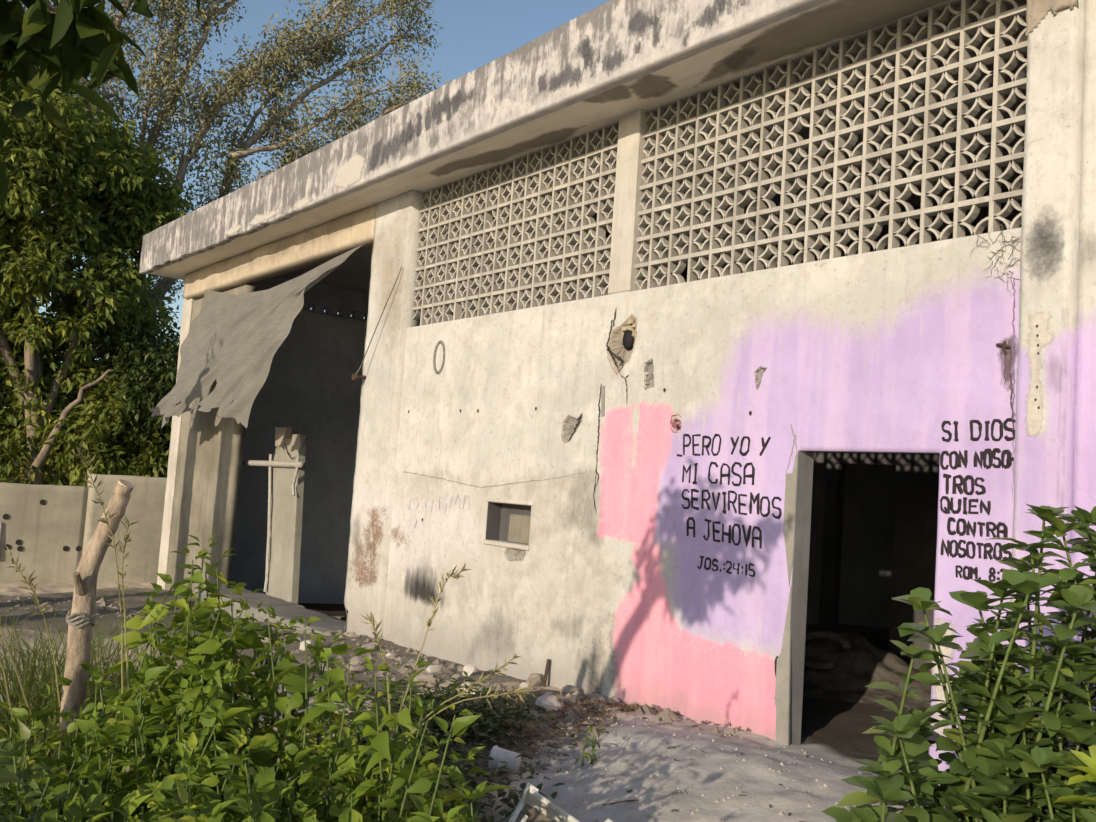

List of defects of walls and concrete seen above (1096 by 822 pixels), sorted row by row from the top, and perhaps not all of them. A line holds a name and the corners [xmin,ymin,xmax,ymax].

leakage [538,9,660,92]
leakage [682,0,726,46]
leakage [705,0,945,81]
spalling [1025,0,1079,37]
leakage [370,90,473,169]
leakage [431,129,573,176]
crack [406,310,628,510]
spalling [561,413,583,443]
spalling [607,314,637,375]
spalling [644,359,654,390]
crack [970,221,1021,502]
rust [996,338,1016,435]